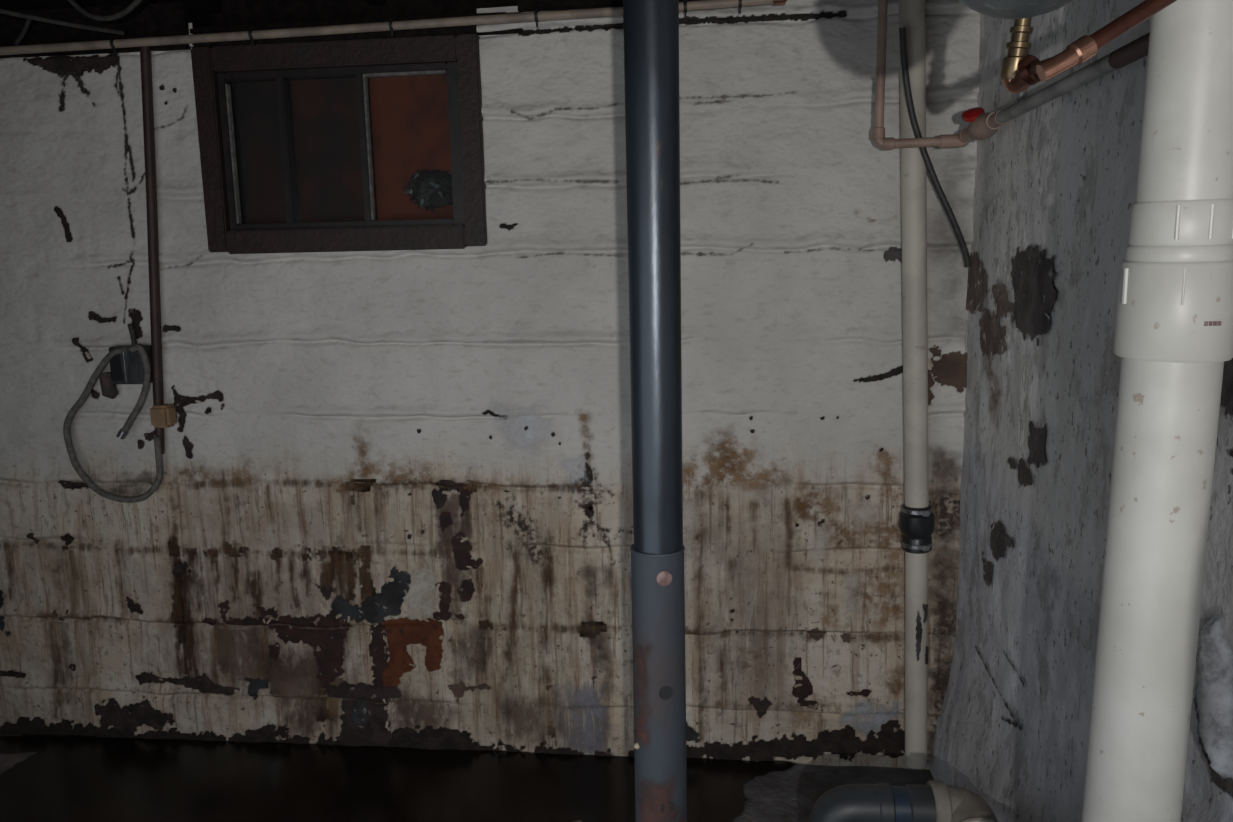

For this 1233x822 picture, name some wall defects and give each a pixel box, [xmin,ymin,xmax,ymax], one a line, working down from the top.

peeling [928,244,1057,406]
peeling [1008,421,1046,487]
damp [497,501,543,563]
damp [683,501,696,528]
damp [931,453,960,646]
peeling [202,480,483,746]
damp [405,569,435,617]
peeling [94,698,175,735]
peeling [135,672,269,700]
damp [0,623,634,757]
damp [686,720,905,761]
peeling [792,657,818,710]